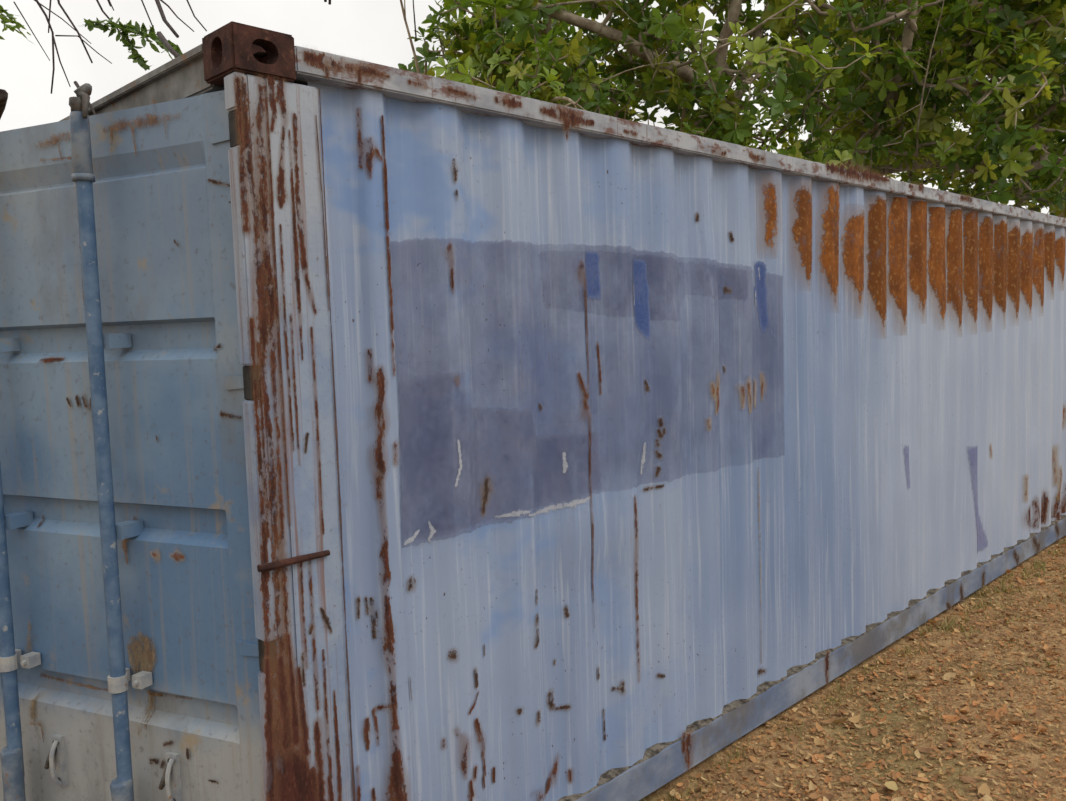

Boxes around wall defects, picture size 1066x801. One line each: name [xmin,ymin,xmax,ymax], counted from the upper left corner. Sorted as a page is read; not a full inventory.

corrosion [103,114,180,154]
corrosion [495,96,522,108]
corrosion [540,107,594,140]
corrosion [762,182,778,247]
corrosion [792,161,1066,327]
corrosion [234,51,408,801]
corrosion [1025,451,1066,528]
corrosion [443,691,495,801]
corrosion [538,756,572,801]